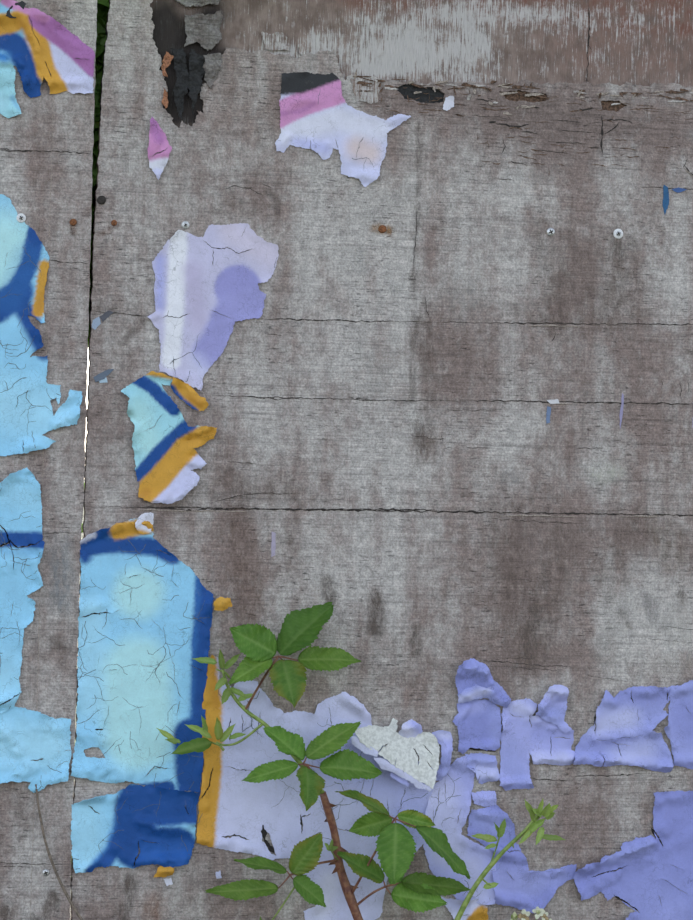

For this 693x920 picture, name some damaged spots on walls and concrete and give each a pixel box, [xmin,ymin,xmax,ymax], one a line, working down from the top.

peeling [0,0,95,118]
peeling [443,96,454,111]
peeling [275,72,411,187]
crack [268,298,693,341]
crack [218,383,689,411]
crack [87,492,693,524]
peeling [0,194,693,920]